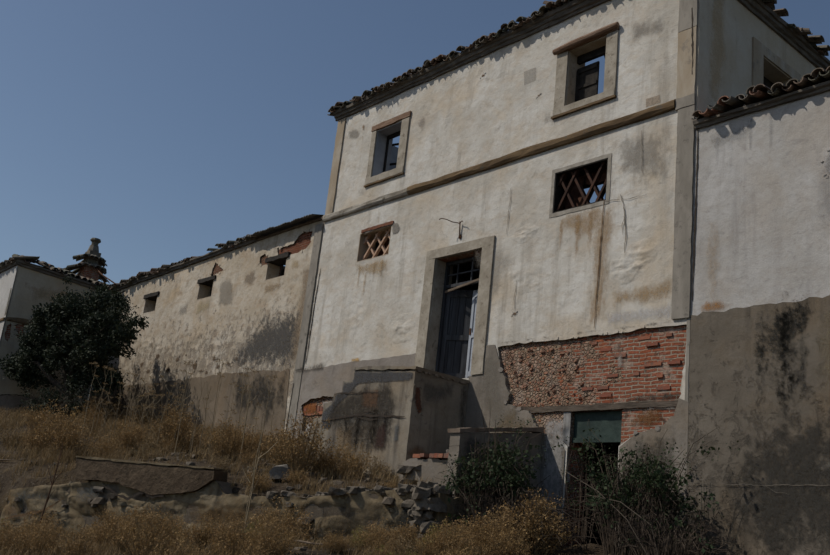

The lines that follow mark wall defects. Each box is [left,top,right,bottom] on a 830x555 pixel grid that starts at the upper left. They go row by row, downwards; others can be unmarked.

crack [688,8,696,74]
flaking render [279,229,312,254]
crack [594,194,647,326]
water stain [231,308,322,421]
water stain [329,386,398,450]
flaking render [543,421,564,505]
water stain [727,304,830,555]